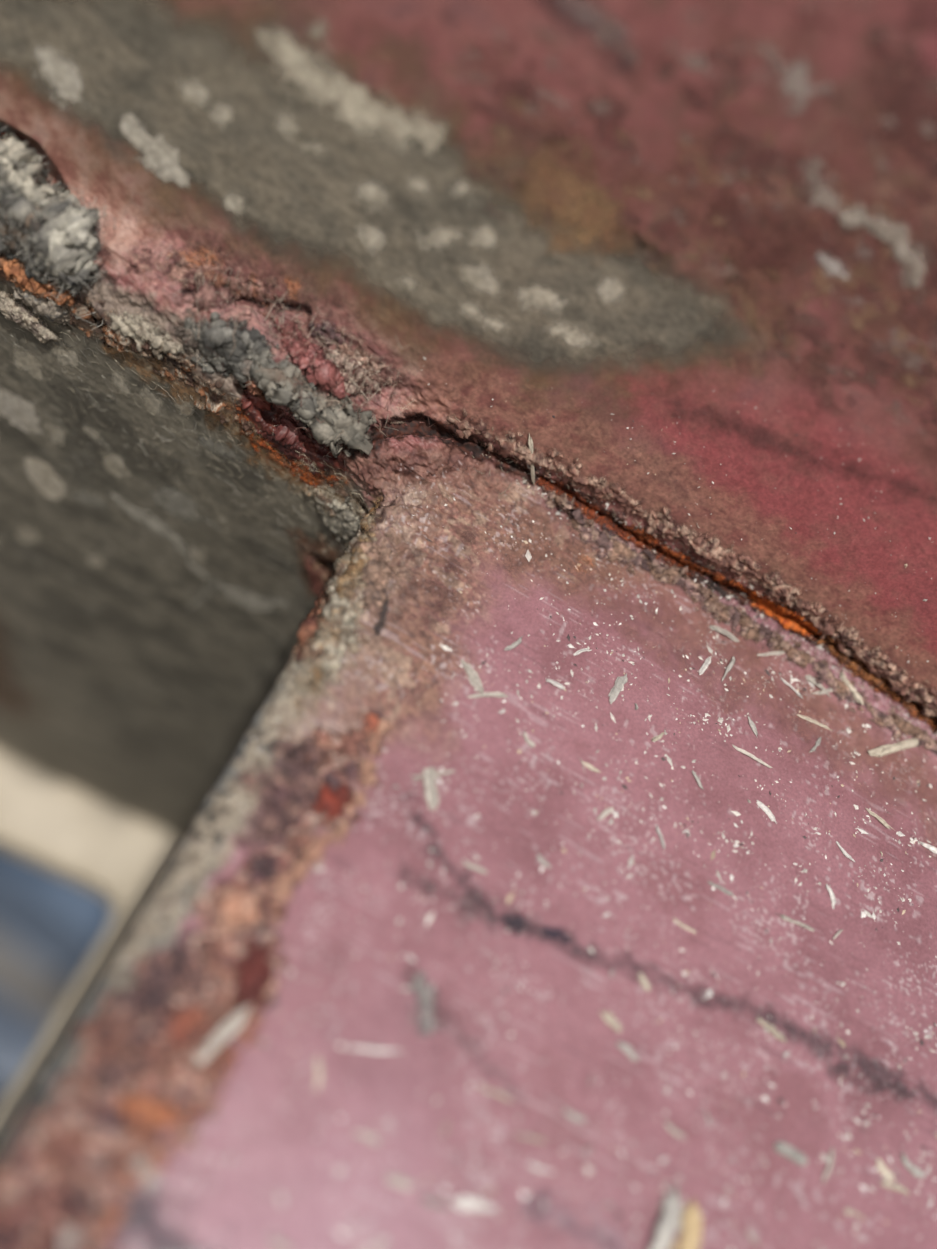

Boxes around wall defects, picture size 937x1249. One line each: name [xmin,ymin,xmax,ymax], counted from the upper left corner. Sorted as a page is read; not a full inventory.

corrosion [65,248,252,436]
corrosion [111,247,310,318]
peeling [0,0,767,388]
crack [288,499,395,663]
crack [342,409,937,754]